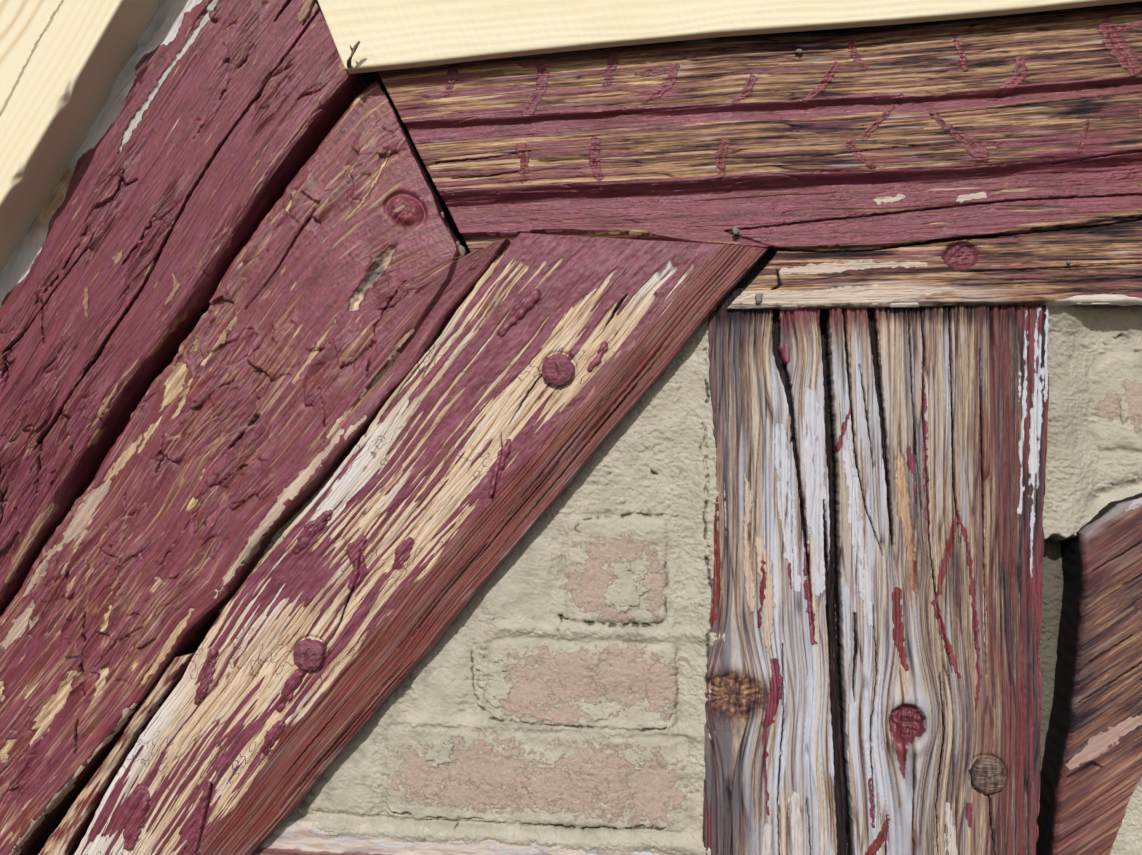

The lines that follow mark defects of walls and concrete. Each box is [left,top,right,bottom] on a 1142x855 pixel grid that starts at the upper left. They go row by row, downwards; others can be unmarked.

crack [0,0,64,116]
crack [38,125,229,482]
crack [246,211,315,309]
crack [603,295,627,331]
peeling [1,317,237,649]
peeling [74,255,694,855]
crack [282,344,671,807]
peeling [743,474,776,653]
crack [726,194,1142,855]
peeling [0,739,16,763]
peeling [30,670,78,745]
peeling [9,703,137,855]